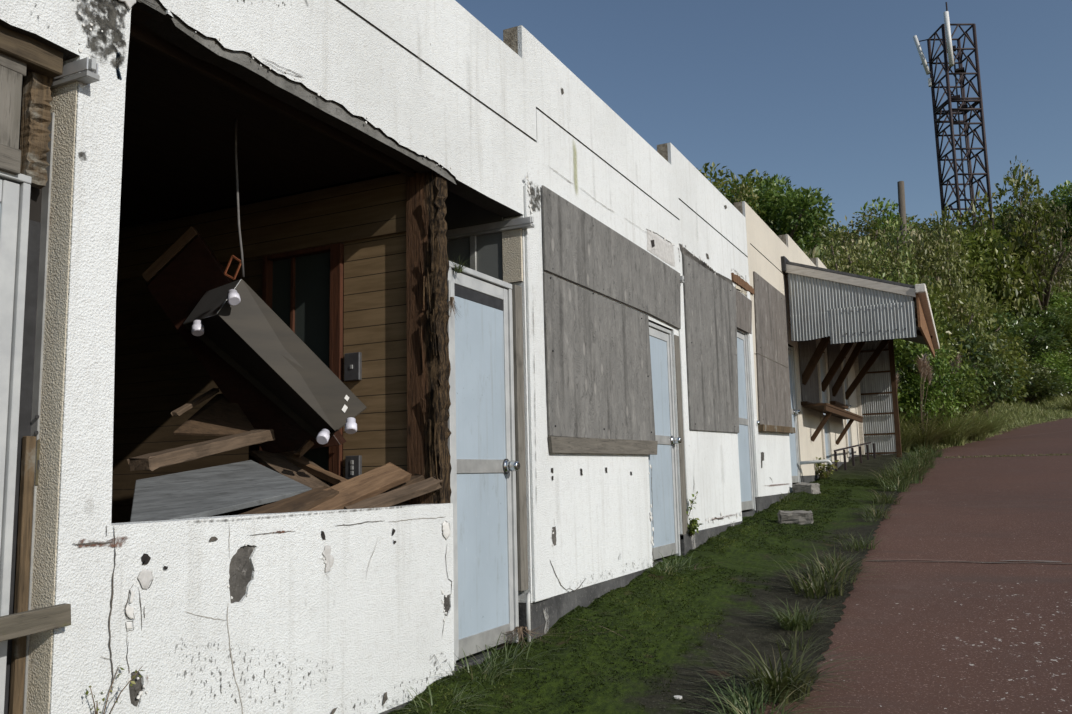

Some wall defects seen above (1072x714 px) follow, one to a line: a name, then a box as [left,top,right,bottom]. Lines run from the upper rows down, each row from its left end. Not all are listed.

spalling [118,0,456,184]
corrosion [73,537,127,547]
crack [101,525,116,694]
spalling [227,544,255,603]